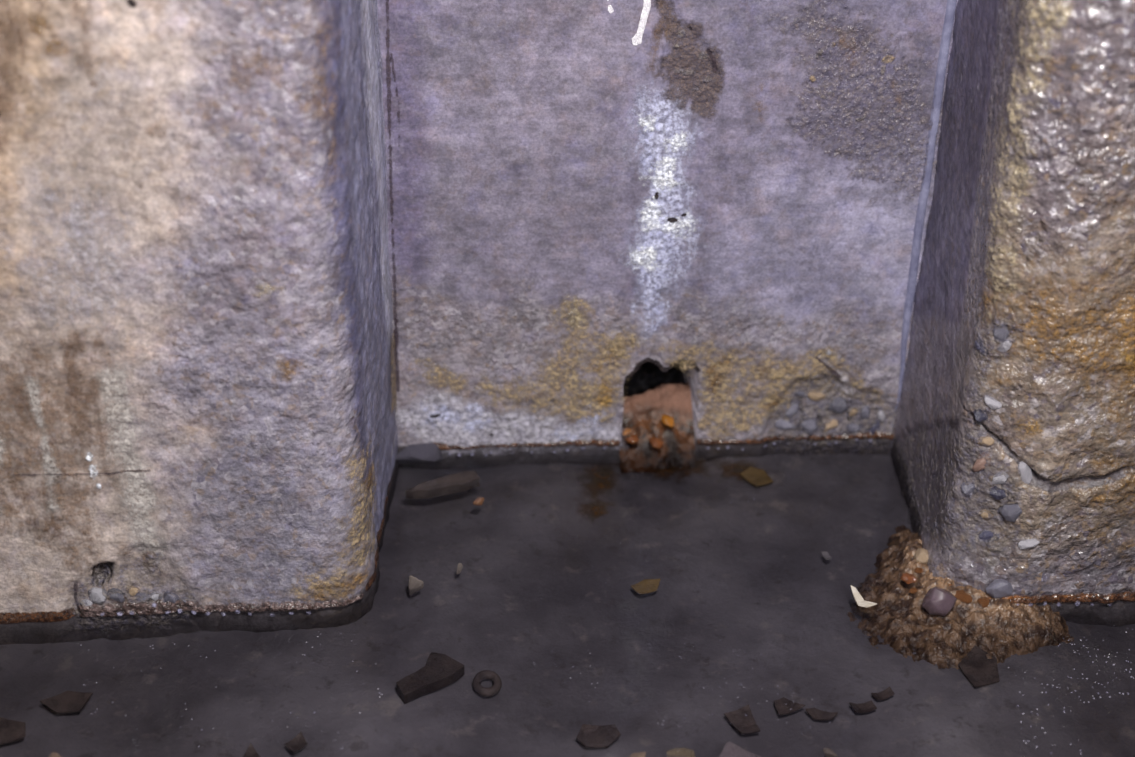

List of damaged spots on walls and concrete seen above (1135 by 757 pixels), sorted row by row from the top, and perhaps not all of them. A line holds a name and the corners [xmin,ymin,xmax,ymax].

leakage [629,94,698,329]
leakage [391,299,635,455]
corrosion [982,269,1135,409]
corrosion [847,525,1135,670]